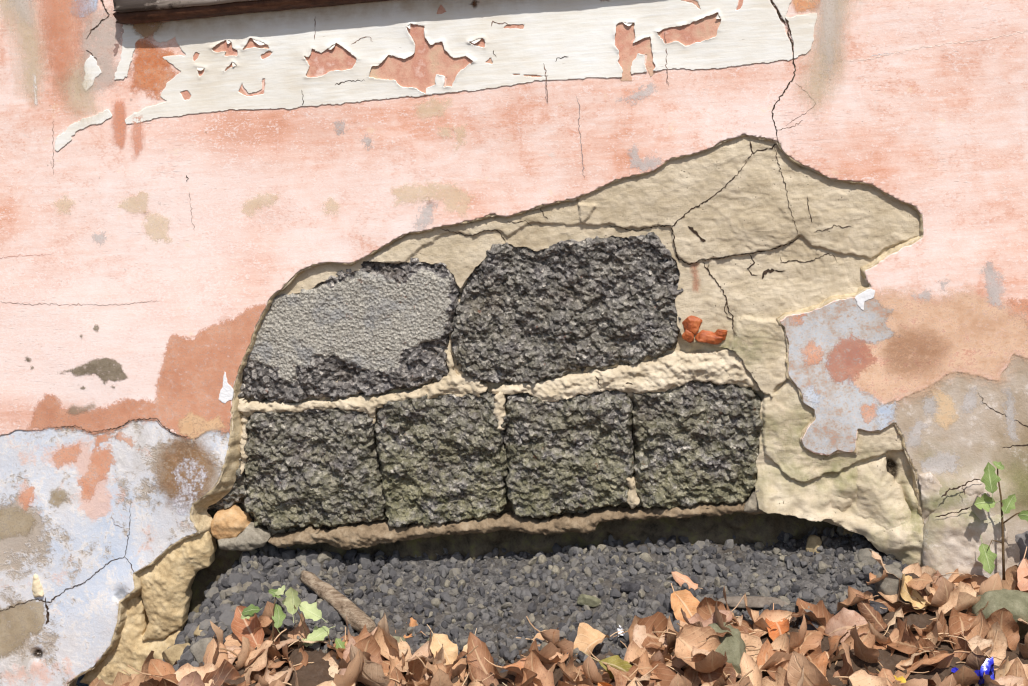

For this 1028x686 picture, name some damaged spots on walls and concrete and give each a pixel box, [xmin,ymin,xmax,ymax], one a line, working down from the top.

peeling [82,24,145,91]
peeling [212,38,272,71]
peeling [304,43,356,77]
peeling [369,24,493,96]
peeling [615,0,721,104]
peeling [55,109,113,151]
crack [609,0,851,331]
flaking render [0,134,929,686]
crack [978,393,1028,448]
peeling [887,354,1028,568]
crack [936,479,980,517]
crack [0,502,134,624]